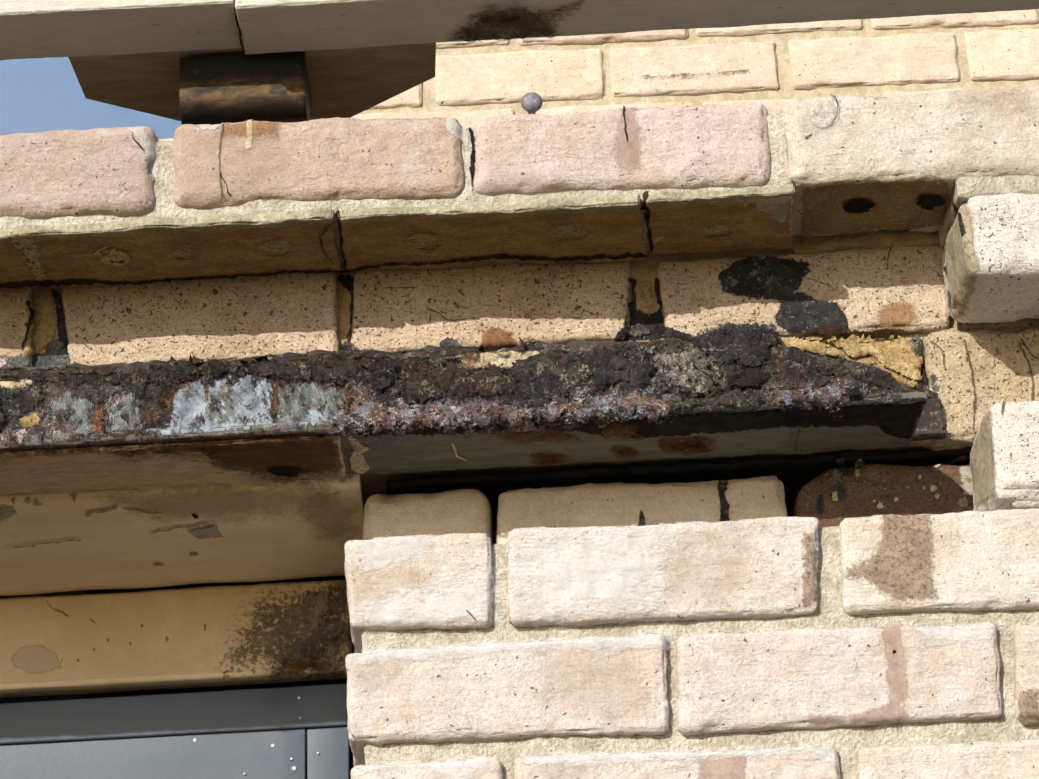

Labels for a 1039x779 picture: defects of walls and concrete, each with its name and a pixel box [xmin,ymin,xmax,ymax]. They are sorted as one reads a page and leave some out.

damp [451,0,583,43]
crack [218,124,229,197]
crack [0,191,654,321]
rust [0,326,927,484]
peeling [436,255,933,441]
rust [879,302,917,332]